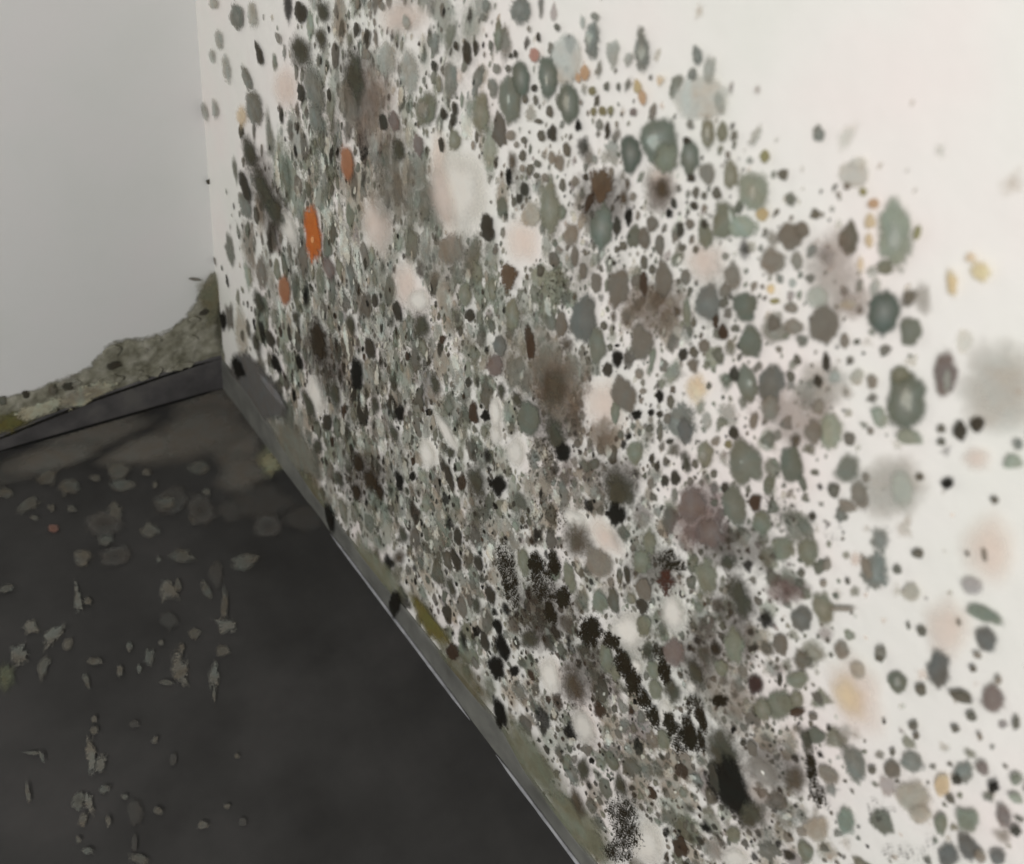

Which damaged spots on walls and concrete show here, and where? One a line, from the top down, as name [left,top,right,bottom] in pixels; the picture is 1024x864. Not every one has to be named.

mould [810,157,867,222]
mould [743,219,875,416]
spalling [0,272,221,433]
leakage [0,414,145,498]
leakage [103,0,849,864]
mould [836,455,870,483]
mould [940,478,954,491]
mould [937,417,985,446]
mould [951,711,977,733]
mould [862,722,938,864]
mould [984,781,1024,841]
mould [818,830,869,864]